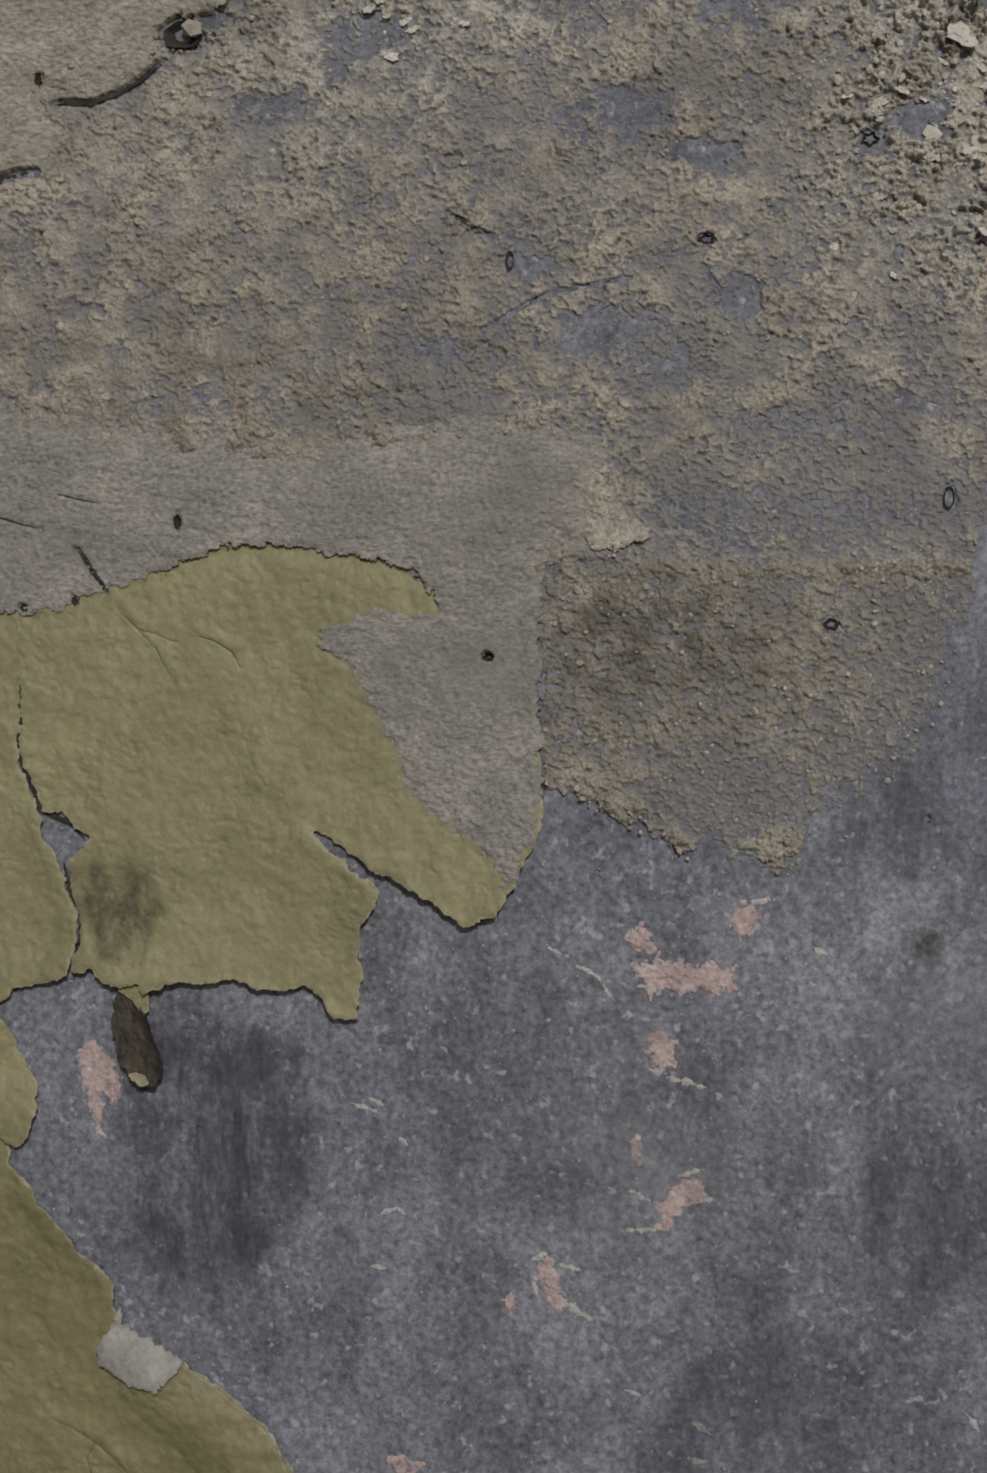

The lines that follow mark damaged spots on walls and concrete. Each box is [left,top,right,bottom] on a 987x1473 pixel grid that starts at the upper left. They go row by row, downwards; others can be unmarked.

crack [56,60,162,106]
crack [0,172,28,184]
flaking render [0,0,987,1138]
crack [16,685,85,974]
peeling [626,1167,713,1234]
peeling [0,1018,294,1473]
peeling [501,1291,517,1312]
peeling [531,1251,593,1321]
peeling [387,1454,426,1473]